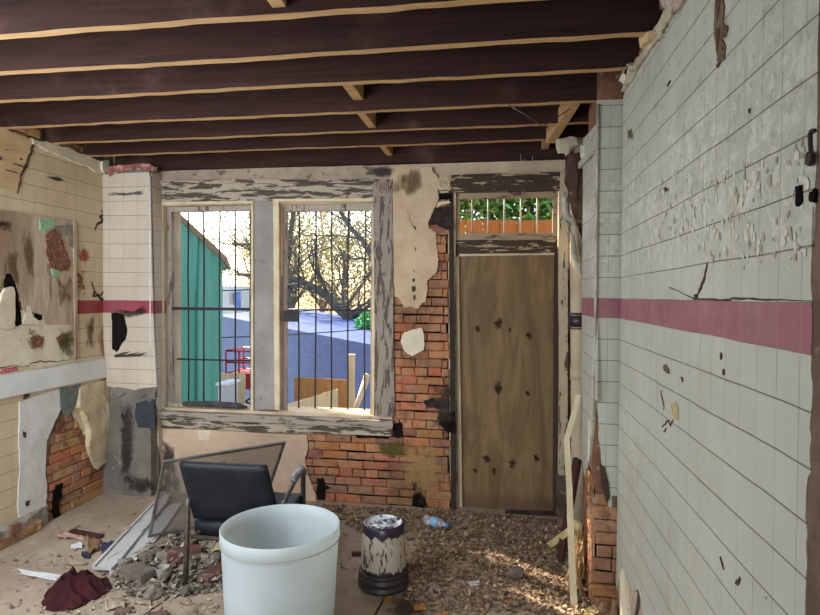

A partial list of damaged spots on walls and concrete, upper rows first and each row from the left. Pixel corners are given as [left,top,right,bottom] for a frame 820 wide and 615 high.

flaking render [619,0,687,92]
crack [16,144,35,193]
crack [669,263,811,302]
flaking render [0,310,74,371]
flaking render [115,387,157,399]
flaking render [304,224,451,509]
flaking render [0,412,104,551]
water stain [121,409,155,493]